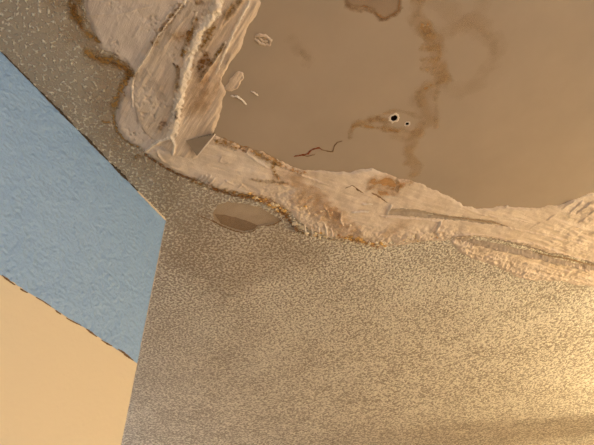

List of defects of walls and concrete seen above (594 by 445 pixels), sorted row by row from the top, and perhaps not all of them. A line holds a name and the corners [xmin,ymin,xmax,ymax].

spalling [388,113,410,126]
crack [294,141,341,157]
rust [102,114,306,234]
rust [369,178,401,195]
spalling [196,192,287,233]